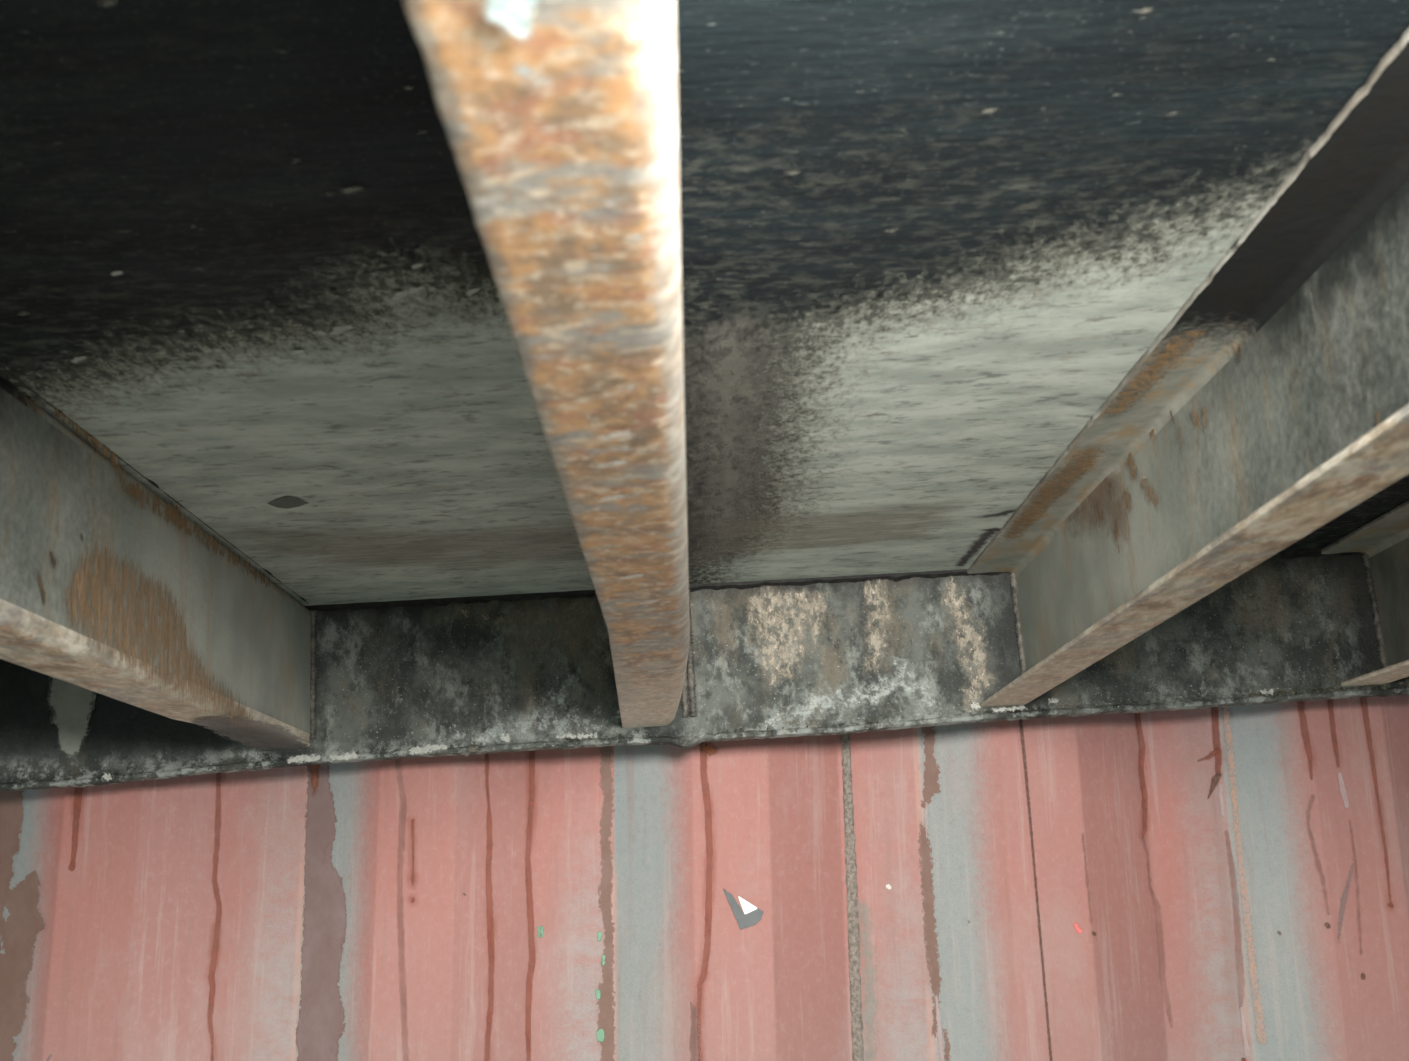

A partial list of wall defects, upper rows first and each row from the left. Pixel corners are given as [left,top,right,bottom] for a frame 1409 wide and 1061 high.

damp [685,317,777,563]
peeling [0,791,46,1061]
peeling [287,752,358,1061]
peeling [409,744,449,755]
rust [485,754,494,1061]
rust [525,750,535,1061]
rust [697,742,716,1061]
damp [748,588,827,684]
damp [765,580,935,727]
peeling [918,726,951,1061]
damp [941,510,1014,708]
rust [1198,706,1266,1058]